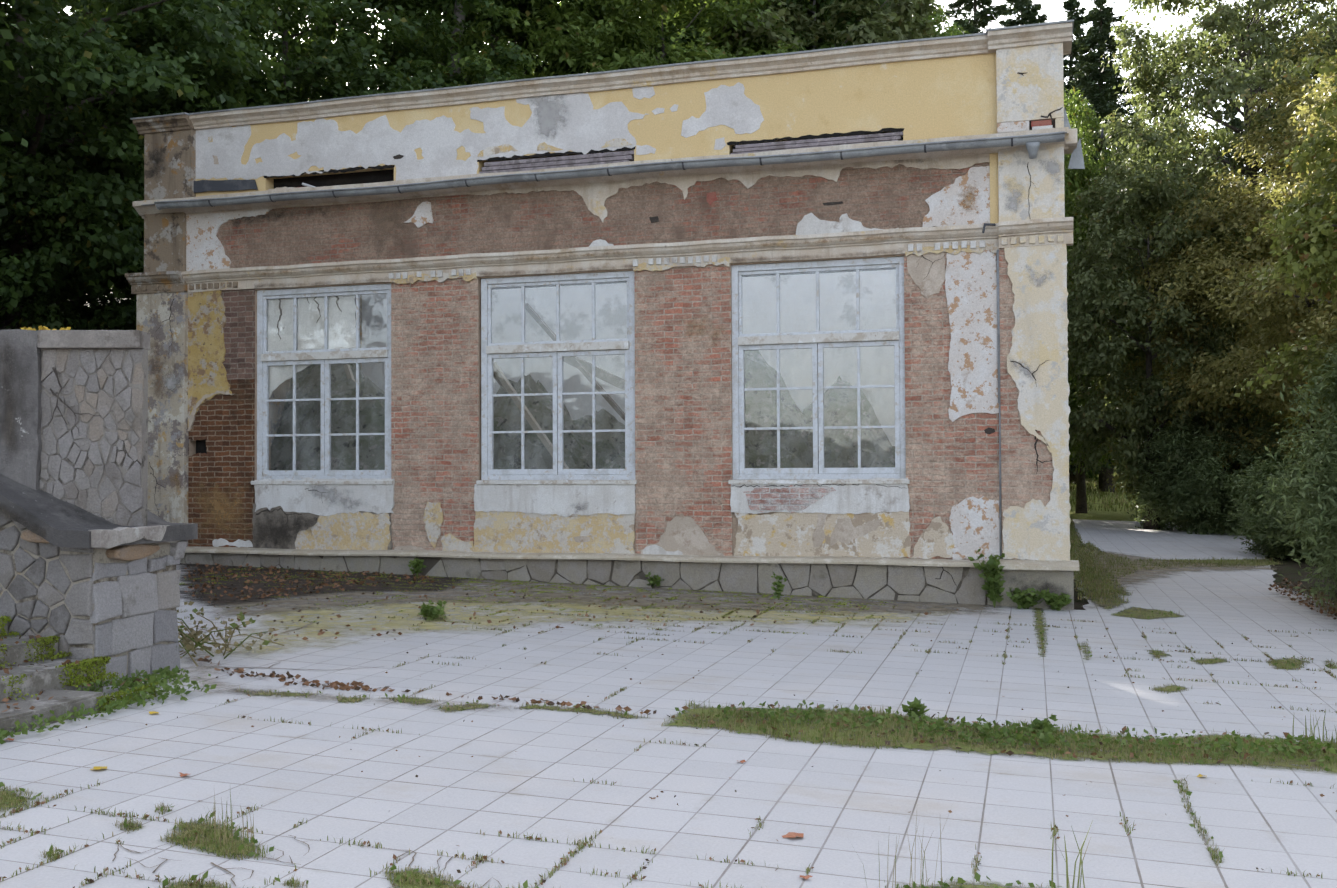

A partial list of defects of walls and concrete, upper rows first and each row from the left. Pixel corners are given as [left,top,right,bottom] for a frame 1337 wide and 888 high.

peeling [196,82,904,180]
flaking render [216,162,990,268]
flaking render [89,252,1002,558]
crack [1010,360,1048,387]
damp [212,517,313,548]
damp [180,563,467,606]